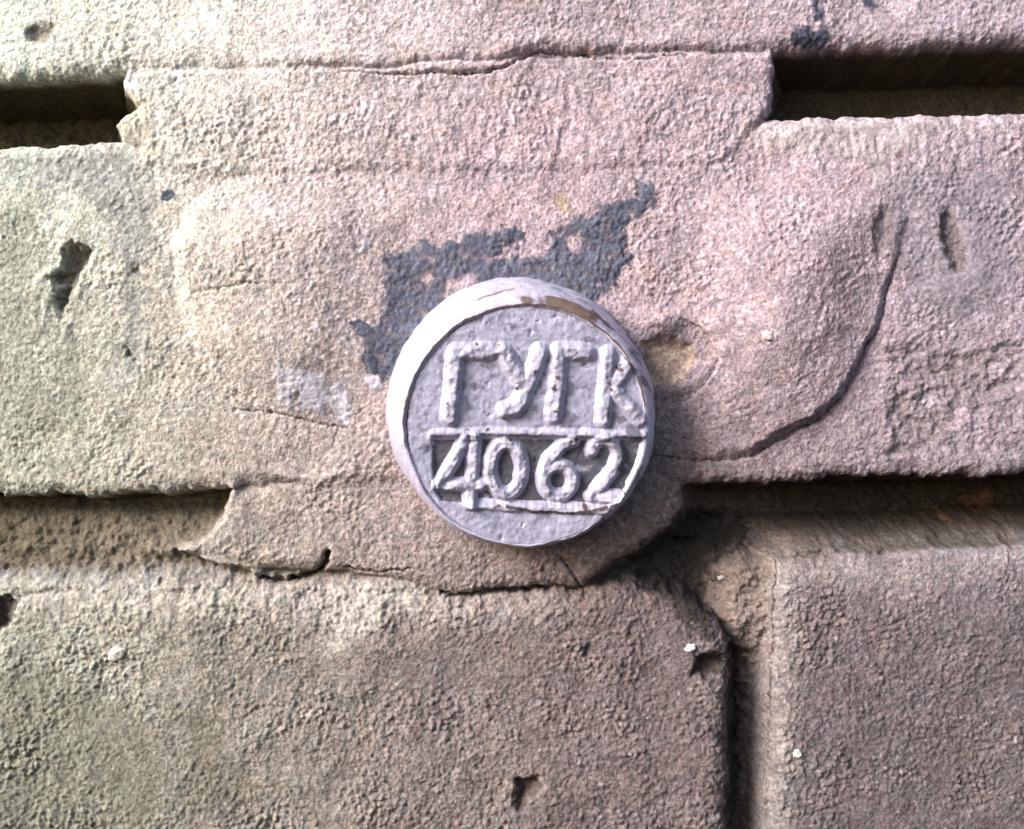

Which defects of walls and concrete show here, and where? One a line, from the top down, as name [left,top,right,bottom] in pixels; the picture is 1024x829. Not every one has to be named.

peeling [635,183,656,207]
peeling [497,225,525,250]
peeling [347,319,372,337]
peeling [363,355,387,391]
crack [262,551,410,582]